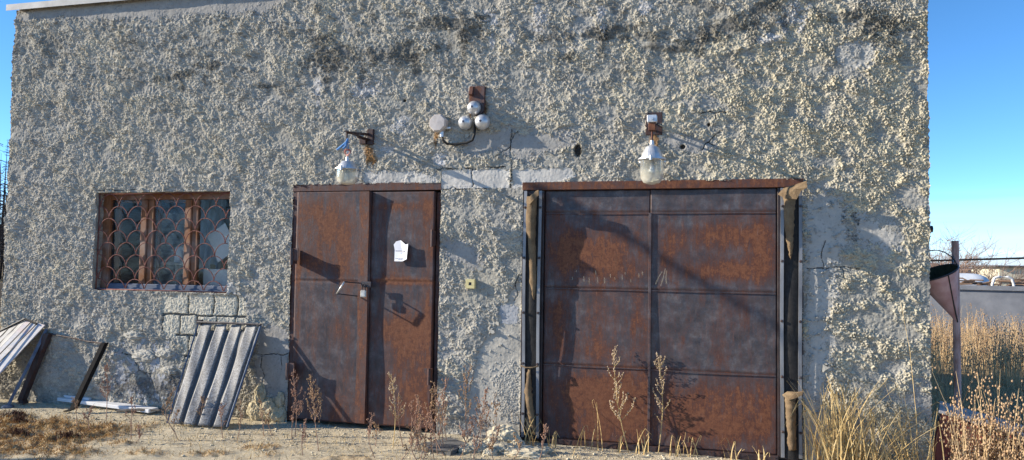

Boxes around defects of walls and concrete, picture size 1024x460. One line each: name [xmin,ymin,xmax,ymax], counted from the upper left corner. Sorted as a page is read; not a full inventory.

flaking render [358,124,580,192]
crack [436,129,518,190]
crack [807,243,858,277]
flaking render [103,281,249,406]